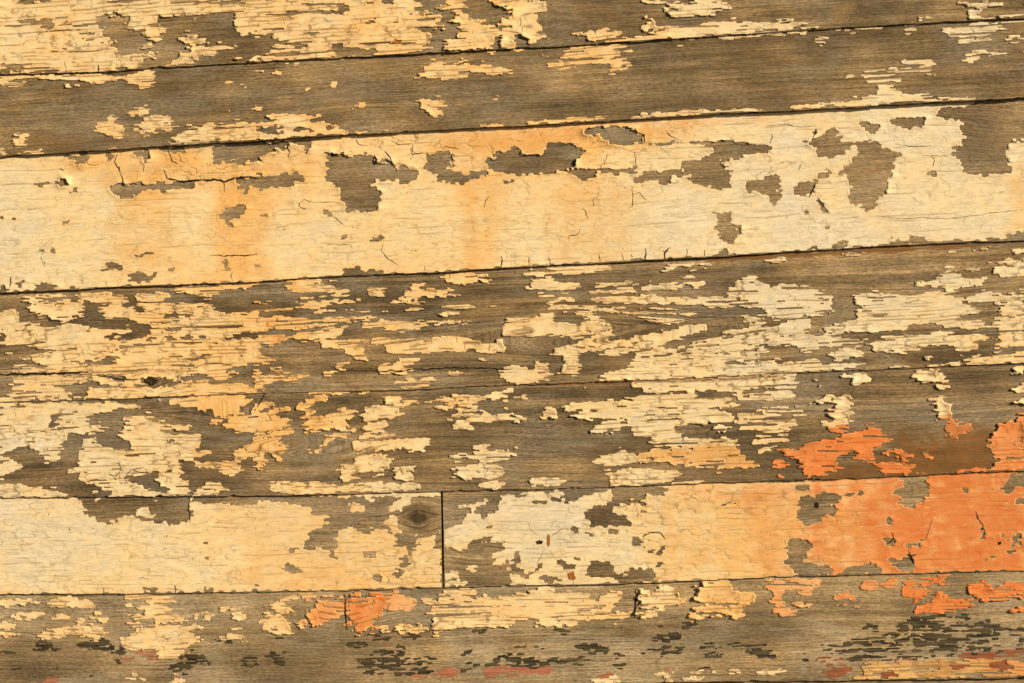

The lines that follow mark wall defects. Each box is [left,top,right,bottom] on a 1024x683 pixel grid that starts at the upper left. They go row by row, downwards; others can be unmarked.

peeling [0,0,550,89]
peeling [542,0,883,75]
peeling [941,0,1024,63]
peeling [0,59,1024,474]
peeling [0,291,1024,683]